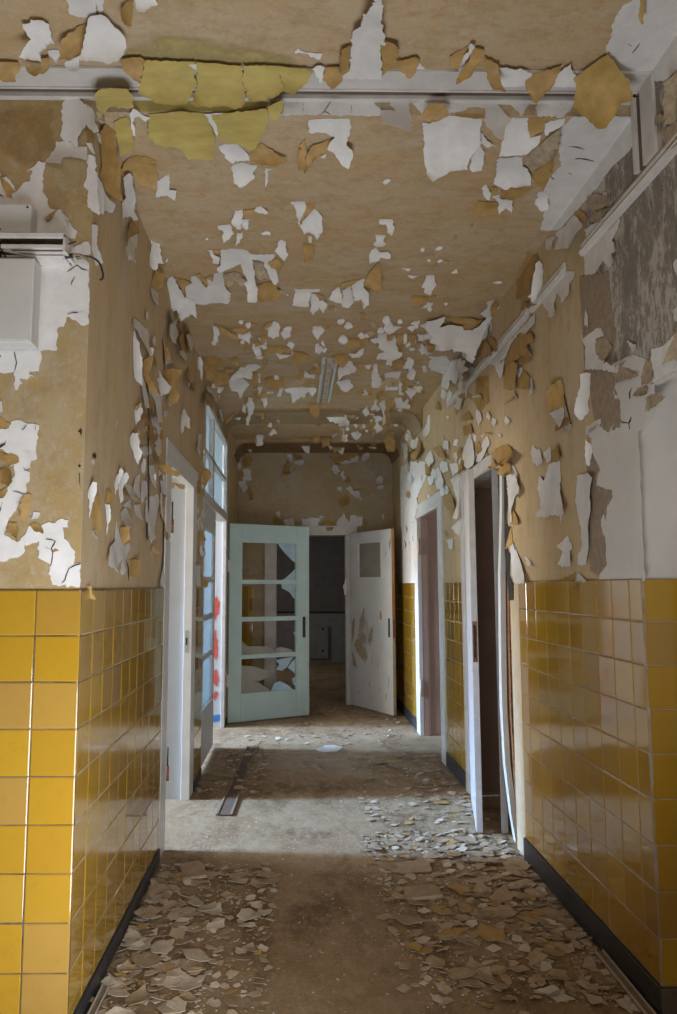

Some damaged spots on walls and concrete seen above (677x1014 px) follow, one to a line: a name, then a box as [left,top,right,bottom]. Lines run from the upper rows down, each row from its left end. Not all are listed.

peeling [352,606,382,669]